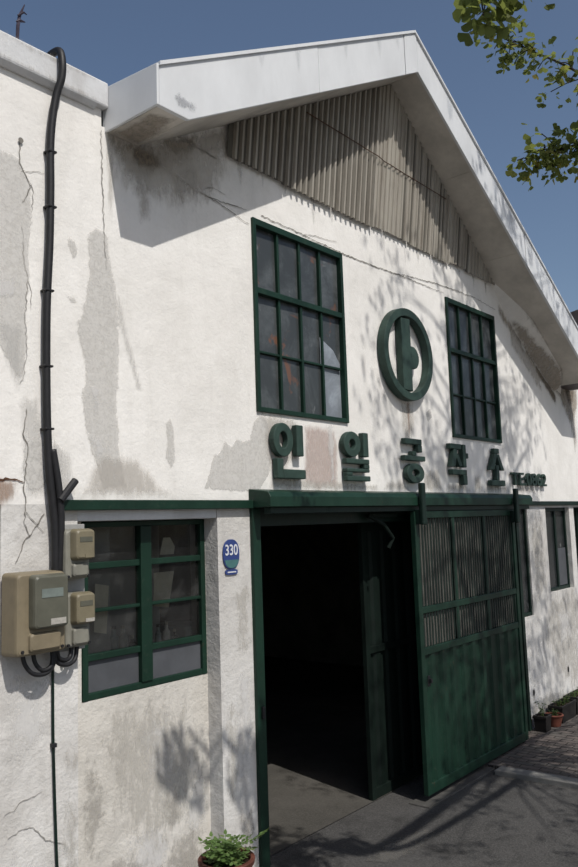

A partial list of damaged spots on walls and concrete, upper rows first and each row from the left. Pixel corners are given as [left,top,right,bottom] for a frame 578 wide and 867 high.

leakage [113,115,223,205]
peeling [0,151,32,376]
crack [163,166,492,308]
peeling [70,229,154,492]
leakage [499,310,576,436]
crack [15,409,44,563]
peeling [166,420,175,465]
peeling [206,416,293,491]
crack [6,792,64,844]